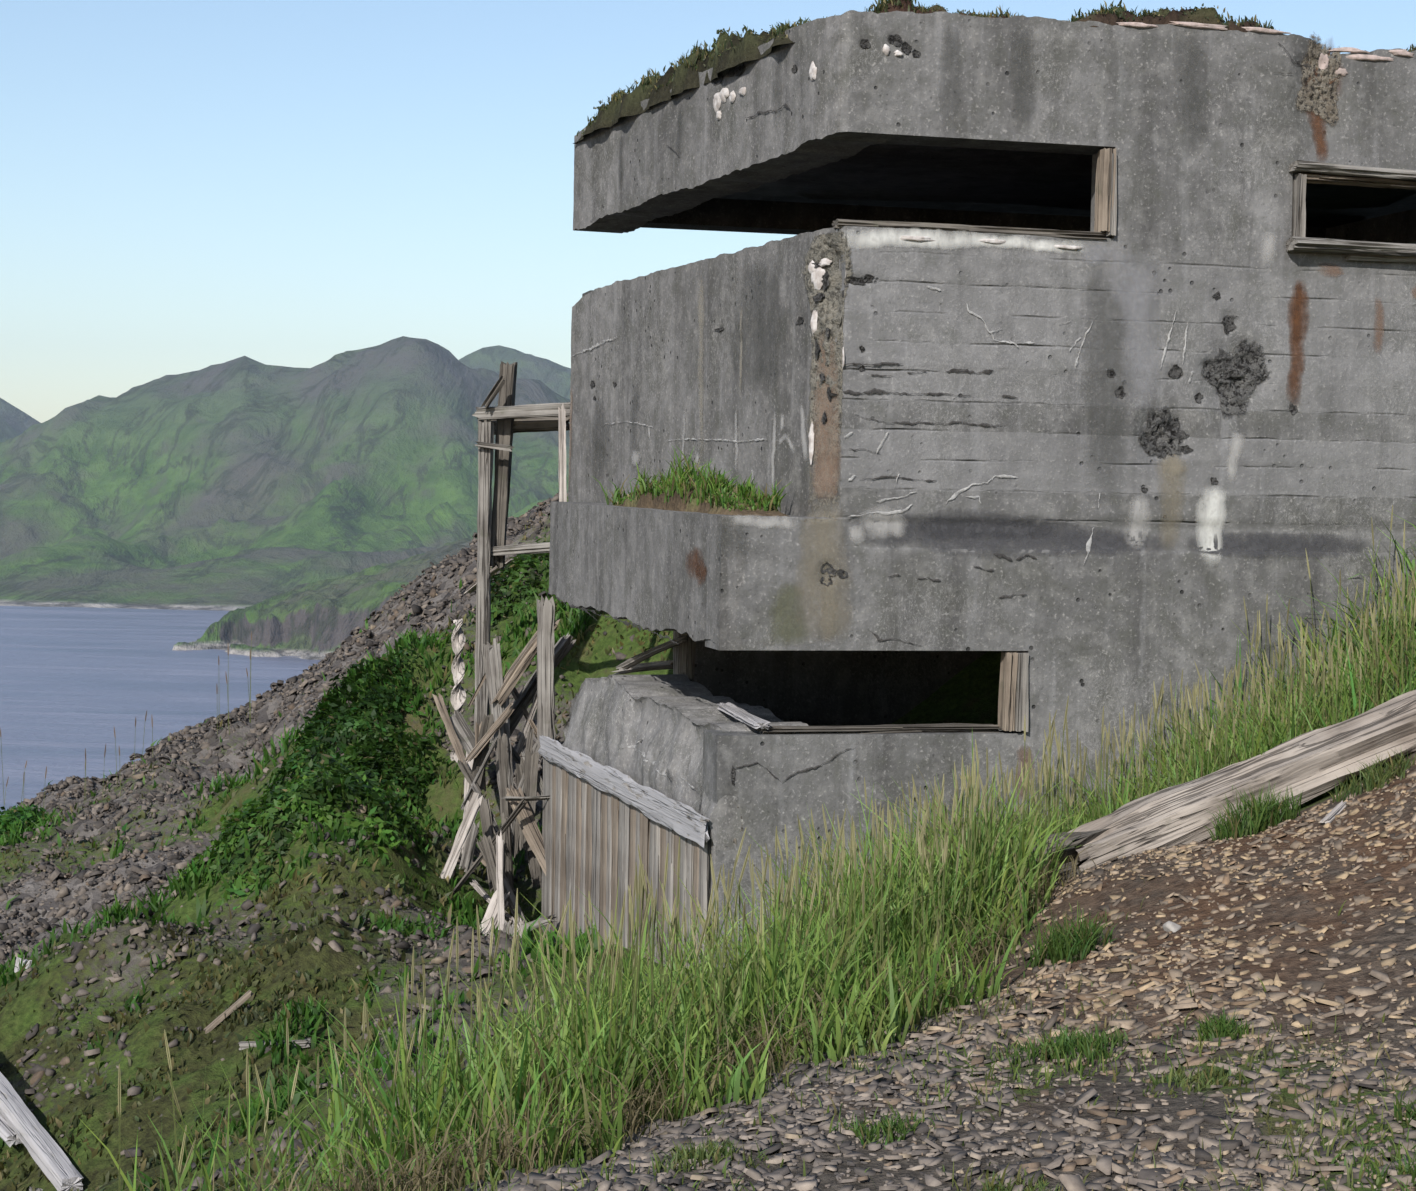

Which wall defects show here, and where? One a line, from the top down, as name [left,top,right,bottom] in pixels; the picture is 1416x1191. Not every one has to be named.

peeling [1116,21,1291,34]
spalling [1296,34,1414,126]
rust [1310,111,1326,155]
spalling [796,230,1084,519]
spalling [1168,364,1183,379]
spalling [1194,315,1269,418]
rust [1289,285,1307,397]
spalling [1138,406,1193,459]
water stain [851,458,1179,554]
water stain [1194,437,1356,559]